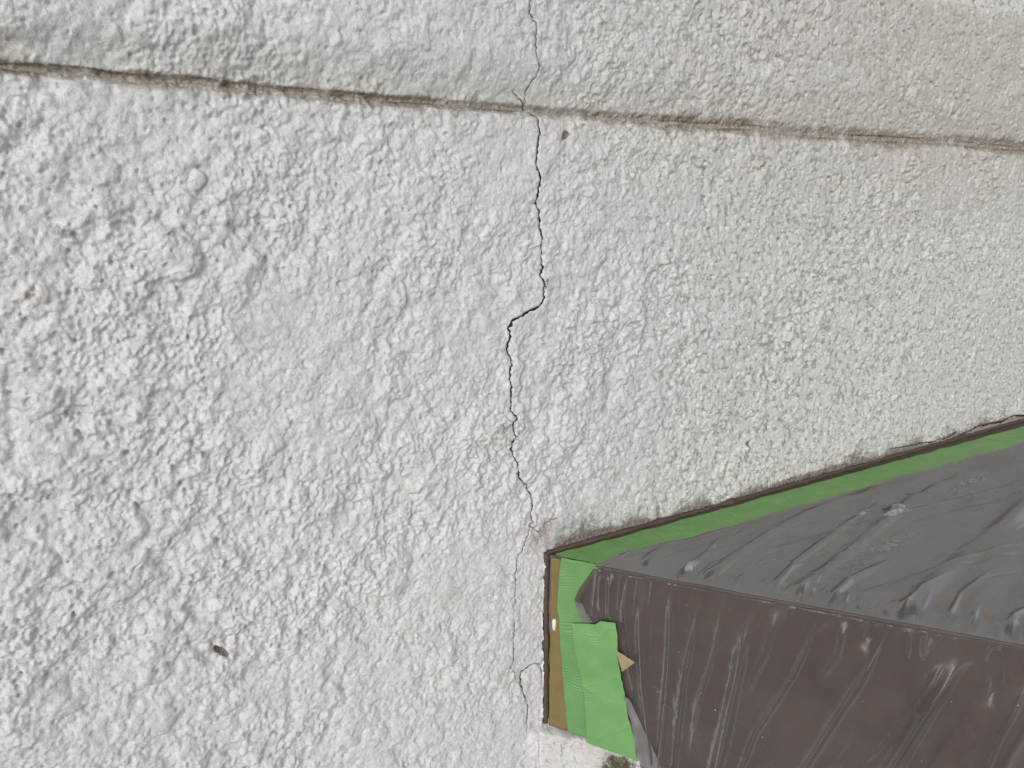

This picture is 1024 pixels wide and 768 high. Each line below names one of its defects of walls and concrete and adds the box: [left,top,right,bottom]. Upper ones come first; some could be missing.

crack [506,0,557,727]